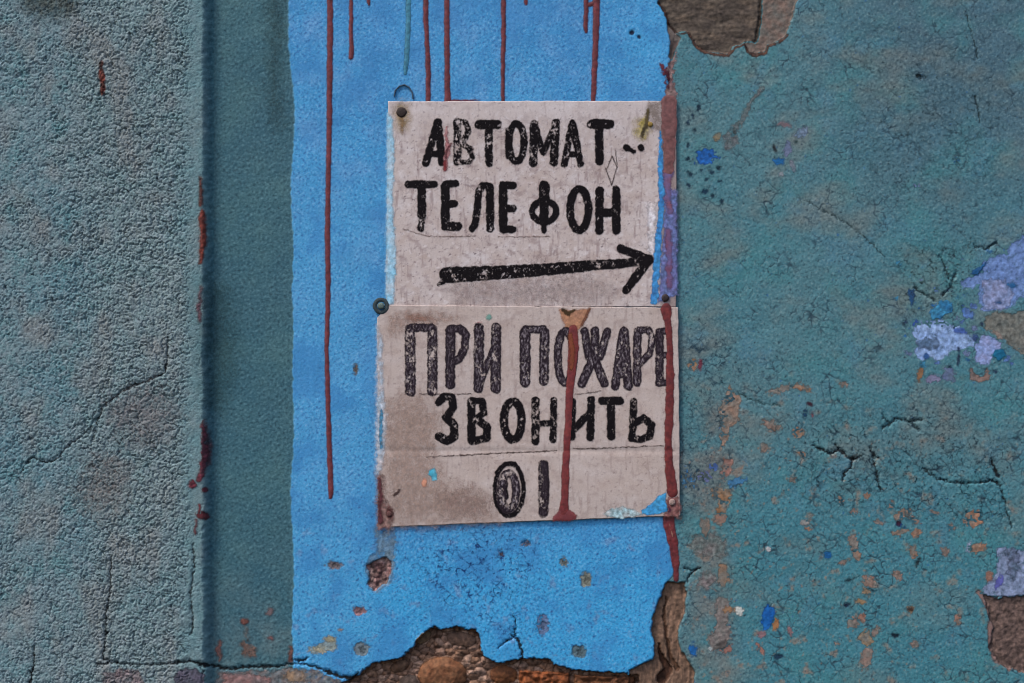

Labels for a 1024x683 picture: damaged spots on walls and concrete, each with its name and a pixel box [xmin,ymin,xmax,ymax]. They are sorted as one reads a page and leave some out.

spalling [658,0,798,98]
peeling [894,235,1024,383]
crack [21,337,169,472]
corrosion [189,419,213,535]
spalling [173,385,748,683]
corrosion [664,496,681,519]
peeling [824,534,861,565]
peeling [873,500,922,566]
crack [800,403,1015,525]
peeling [948,509,983,531]
spalling [967,542,1024,673]